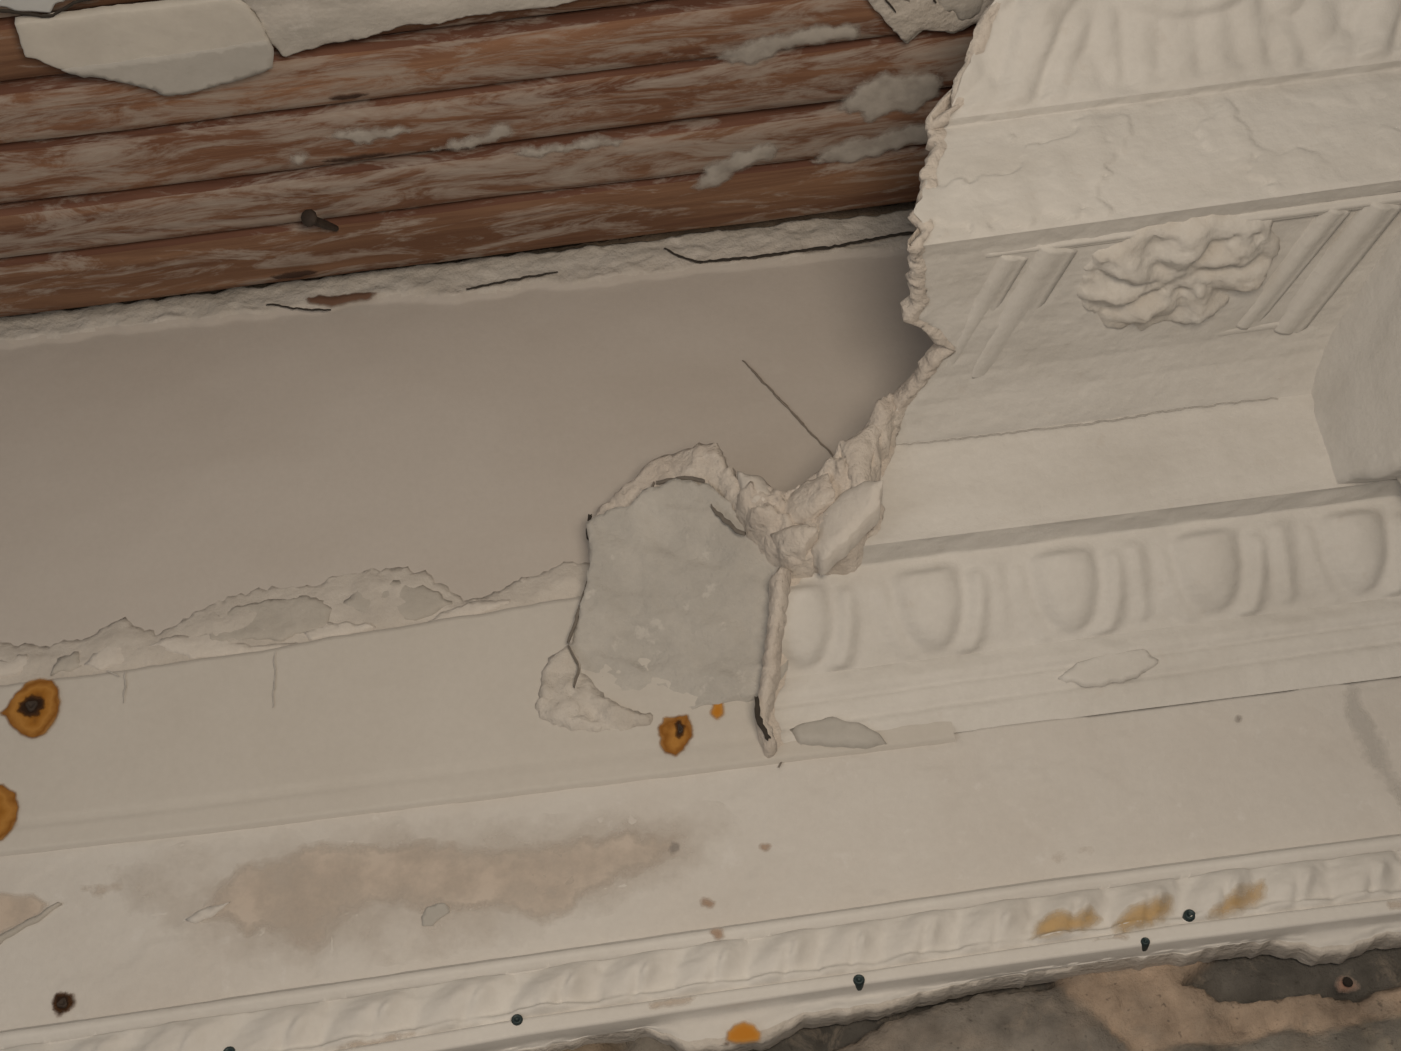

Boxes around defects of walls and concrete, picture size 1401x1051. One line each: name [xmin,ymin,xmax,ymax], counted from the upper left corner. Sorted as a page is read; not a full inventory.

crack [0,0,91,18]
crack [664,231,914,264]
crack [466,271,558,290]
crack [266,303,331,311]
flaking render [0,0,1001,758]
crack [742,360,834,457]
rust [0,678,60,738]
rust [711,703,724,719]
rust [658,715,693,755]
rust [0,785,18,840]